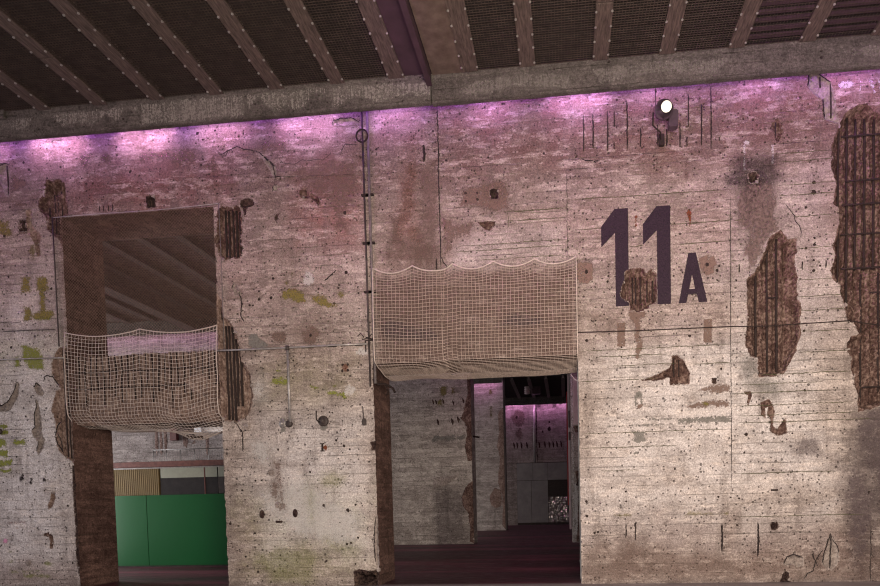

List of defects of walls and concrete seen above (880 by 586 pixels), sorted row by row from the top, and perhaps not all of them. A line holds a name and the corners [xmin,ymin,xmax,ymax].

spalling [19,179,69,257]
spalling [214,198,254,263]
spalling [216,293,254,424]
crack [215,144,359,179]
spalling [620,268,657,313]
spalling [641,355,690,386]
leakage [730,141,779,269]
spalling [739,230,803,377]
spalling [807,74,880,412]
spalling [32,347,80,576]